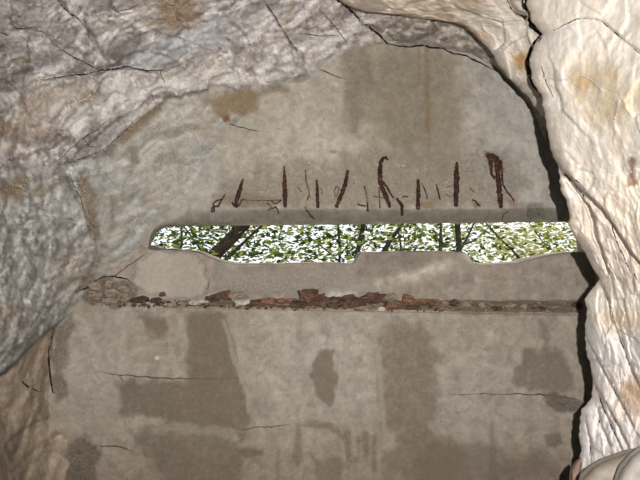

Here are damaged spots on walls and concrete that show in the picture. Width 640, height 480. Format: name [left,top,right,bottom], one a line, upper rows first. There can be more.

corrosion [231,179,248,208]
corrosion [335,170,349,208]
corrosion [378,156,404,216]
corrosion [416,179,432,210]
corrosion [485,152,515,208]
flaking render [83,251,372,309]
crack [22,326,55,393]
crack [97,371,198,382]
water stain [120,313,249,480]
water stain [310,351,337,405]
crack [453,393,578,408]